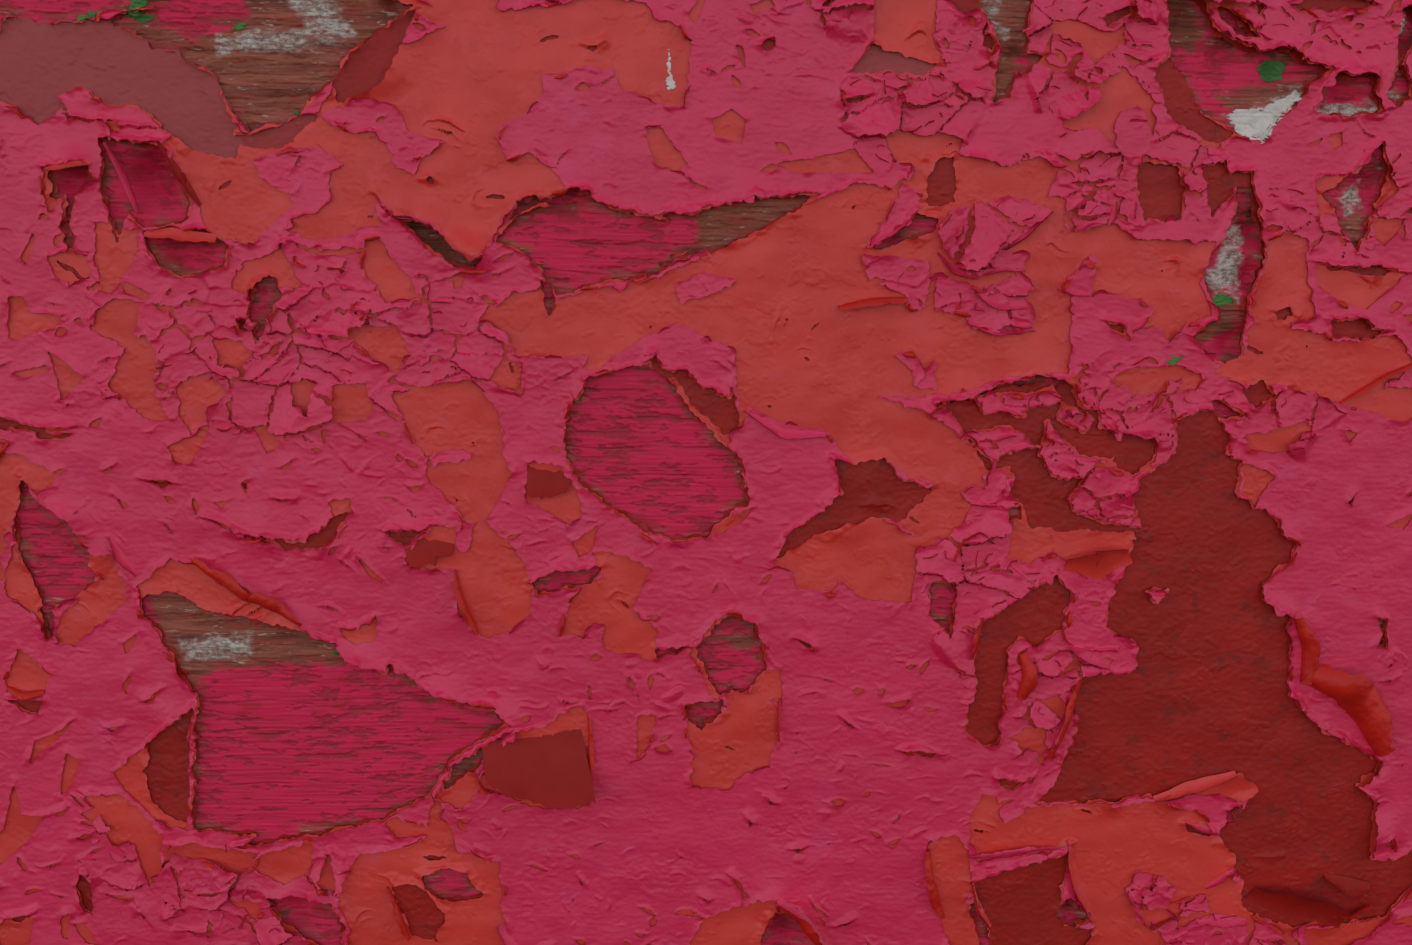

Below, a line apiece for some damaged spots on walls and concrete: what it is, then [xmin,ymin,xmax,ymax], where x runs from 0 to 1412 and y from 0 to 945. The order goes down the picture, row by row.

peeling [0,428,601,945]
peeling [0,0,1129,804]
peeling [670,864,834,945]
peeling [915,0,1412,945]